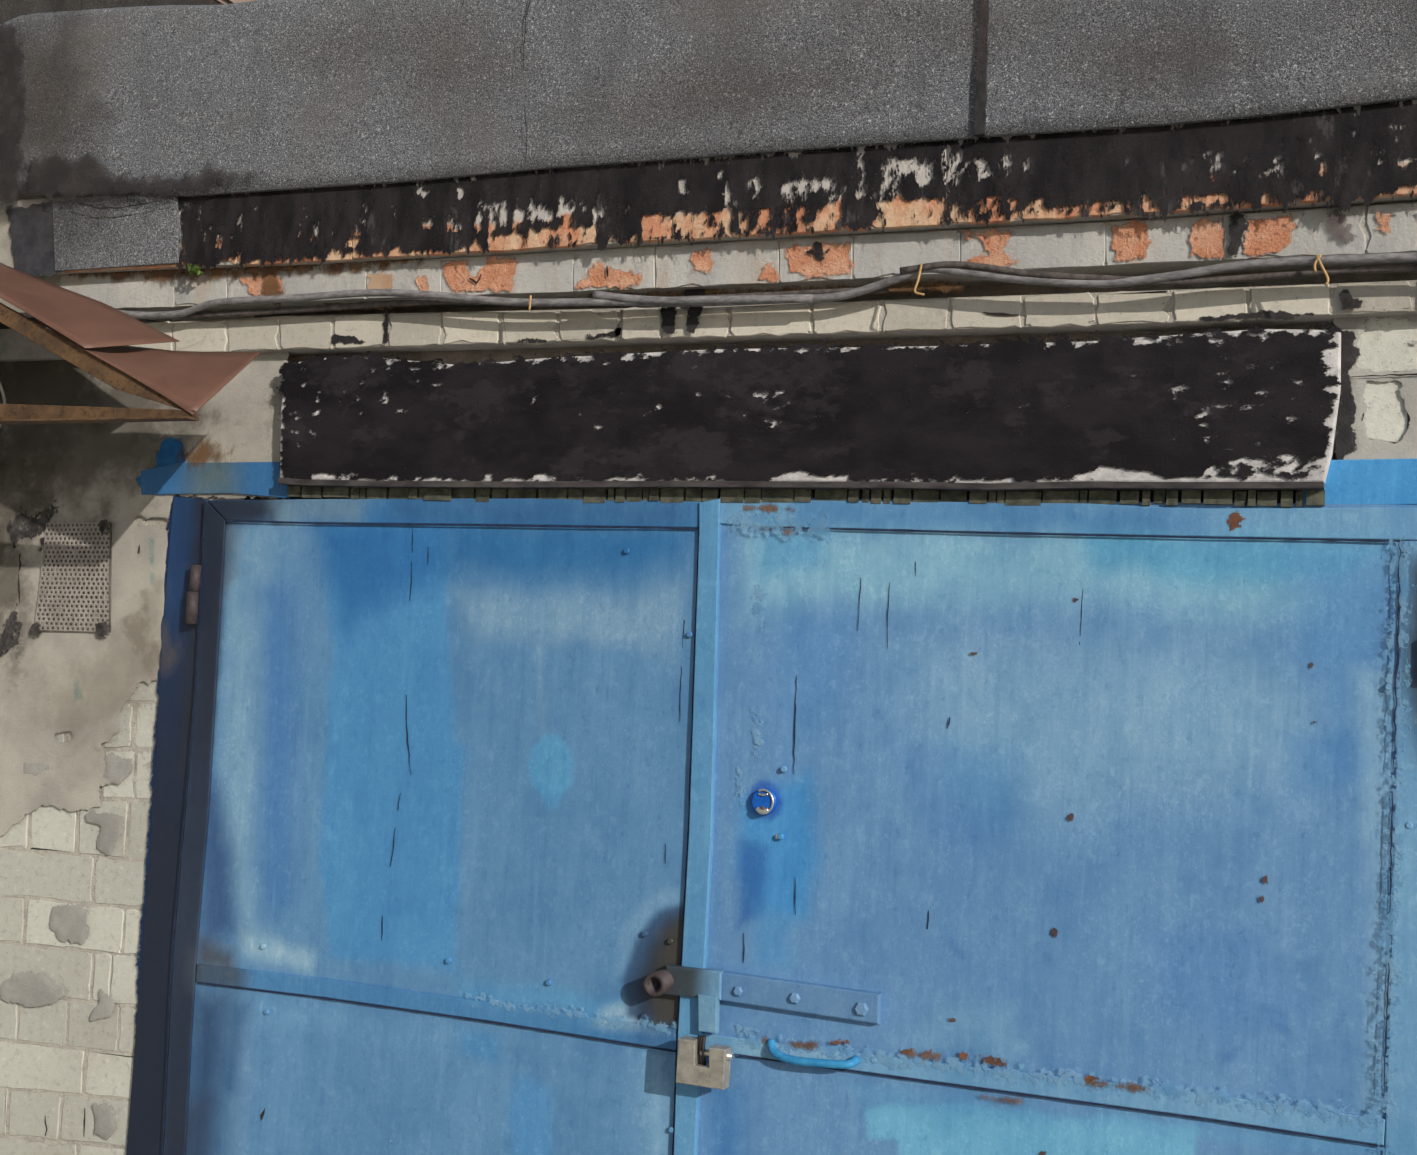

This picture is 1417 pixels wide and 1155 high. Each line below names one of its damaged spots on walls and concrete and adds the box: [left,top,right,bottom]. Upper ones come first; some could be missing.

spalling [758,242,854,283]
spalling [239,275,283,296]
spalling [367,271,393,289]
spalling [415,255,516,293]
spalling [575,261,642,290]
corrosion [791,1039,850,1050]
corrosion [902,1048,940,1061]
corrosion [958,1052,1008,1067]
corrosion [1084,1075,1147,1092]